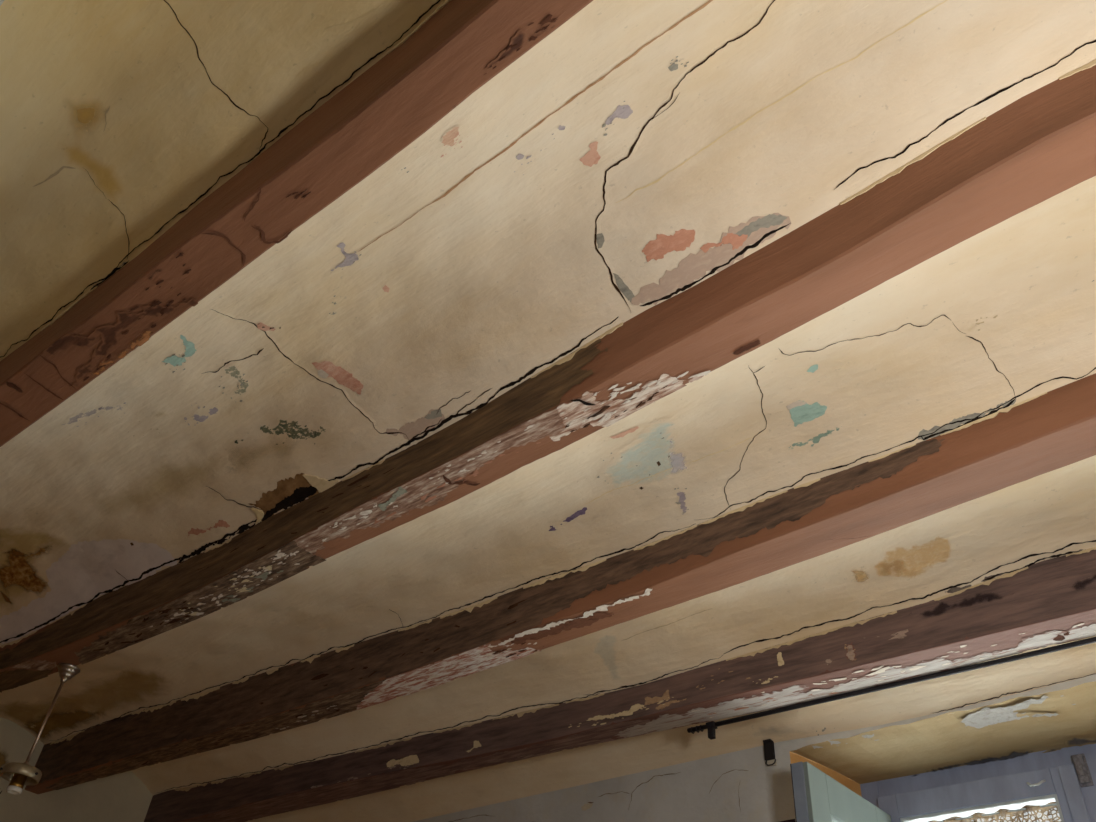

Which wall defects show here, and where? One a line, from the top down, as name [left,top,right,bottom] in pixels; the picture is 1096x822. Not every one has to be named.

leakage [44,109,128,209]
crack [834,40,1096,205]
spalling [631,213,791,306]
peeling [43,270,198,391]
crack [0,0,779,648]
peeling [733,340,760,355]
leakage [0,523,76,618]
peeling [75,365,710,665]
crack [50,315,1096,745]
leakage [854,534,955,582]
peeling [191,623,1096,822]